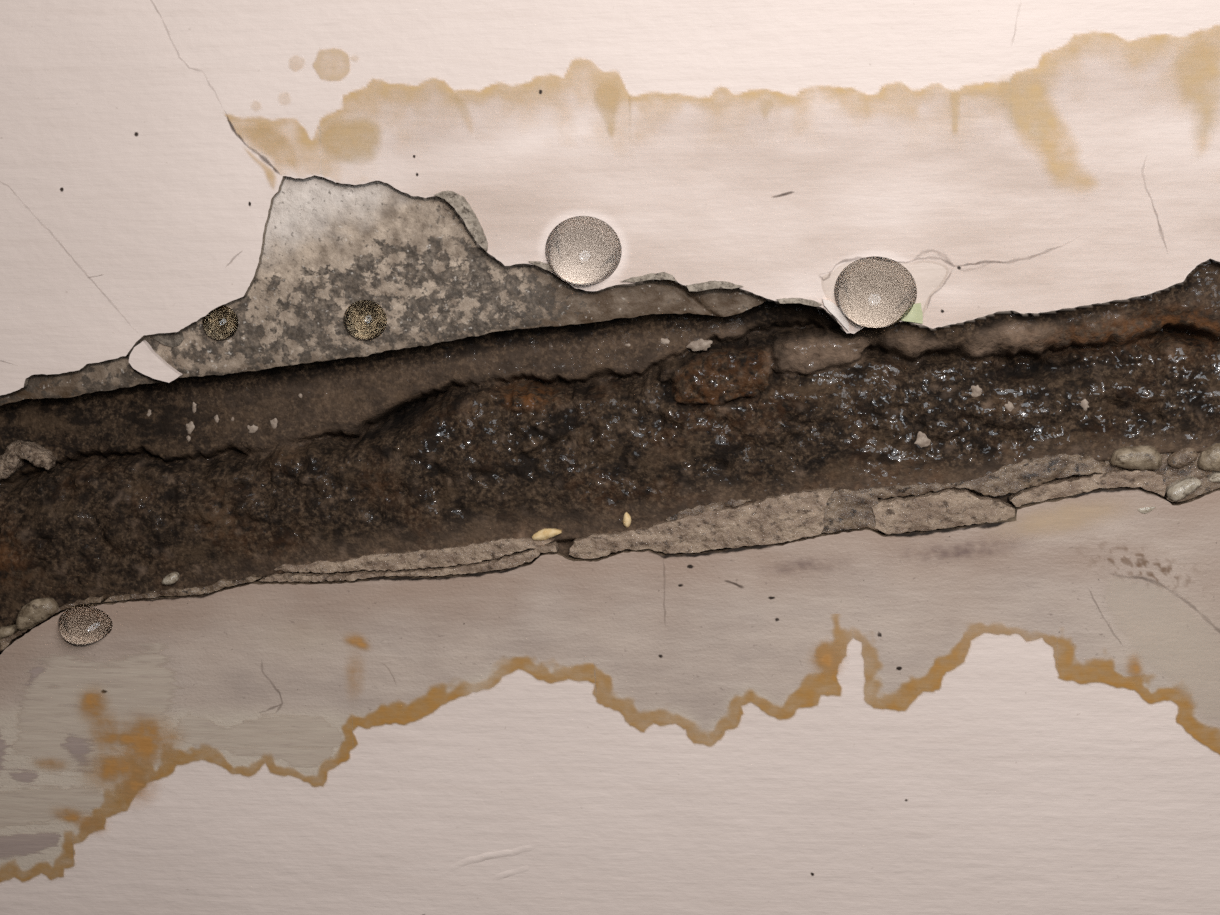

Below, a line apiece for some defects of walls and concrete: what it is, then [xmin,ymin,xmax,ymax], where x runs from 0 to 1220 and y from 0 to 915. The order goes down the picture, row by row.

leakage [313,49,349,80]
leakage [227,61,804,151]
leakage [824,85,927,108]
leakage [953,33,1168,184]
spalling [0,176,1220,881]
corrosion [347,636,367,648]
corrosion [490,617,848,745]
corrosion [864,630,1010,711]
corrosion [1044,637,1220,754]
corrosion [0,685,466,882]